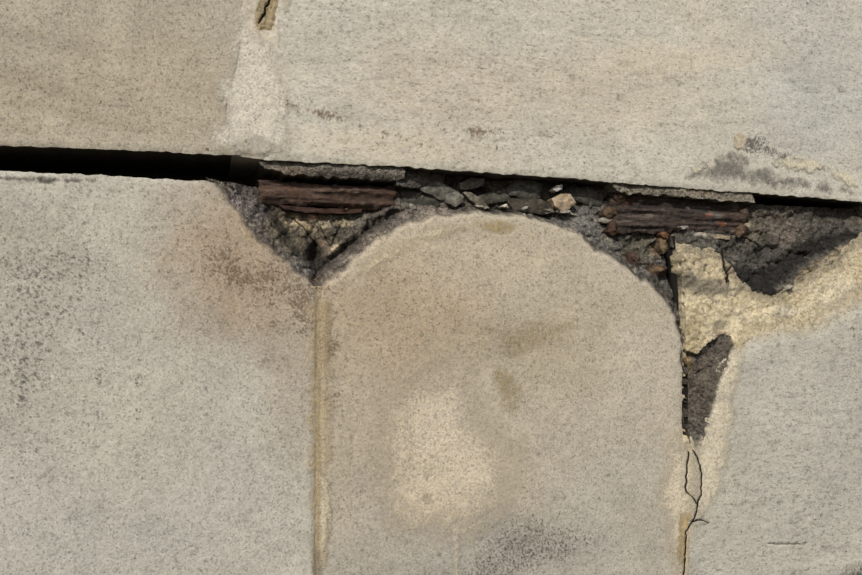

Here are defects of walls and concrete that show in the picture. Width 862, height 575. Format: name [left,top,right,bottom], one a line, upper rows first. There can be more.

peeling [208,177,862,448]
crack [664,235,679,322]
crack [682,363,708,575]